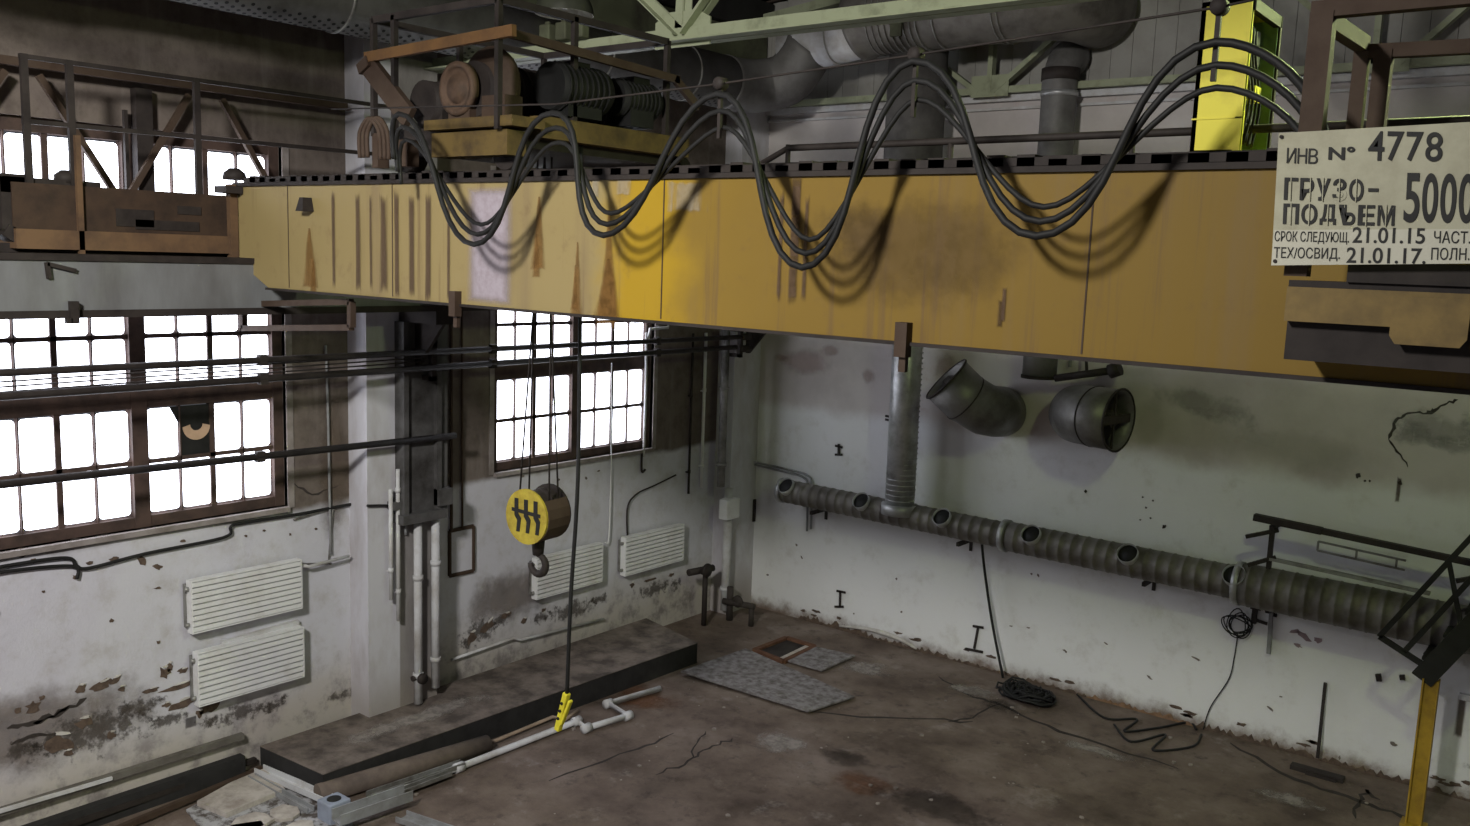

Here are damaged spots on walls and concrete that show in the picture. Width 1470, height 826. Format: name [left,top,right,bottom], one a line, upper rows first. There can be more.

crack [1388,399,1458,467]
peeling [468,607,546,646]
peeling [14,695,45,714]
peeling [75,661,220,719]
peeling [44,715,116,756]
crack [549,731,733,781]